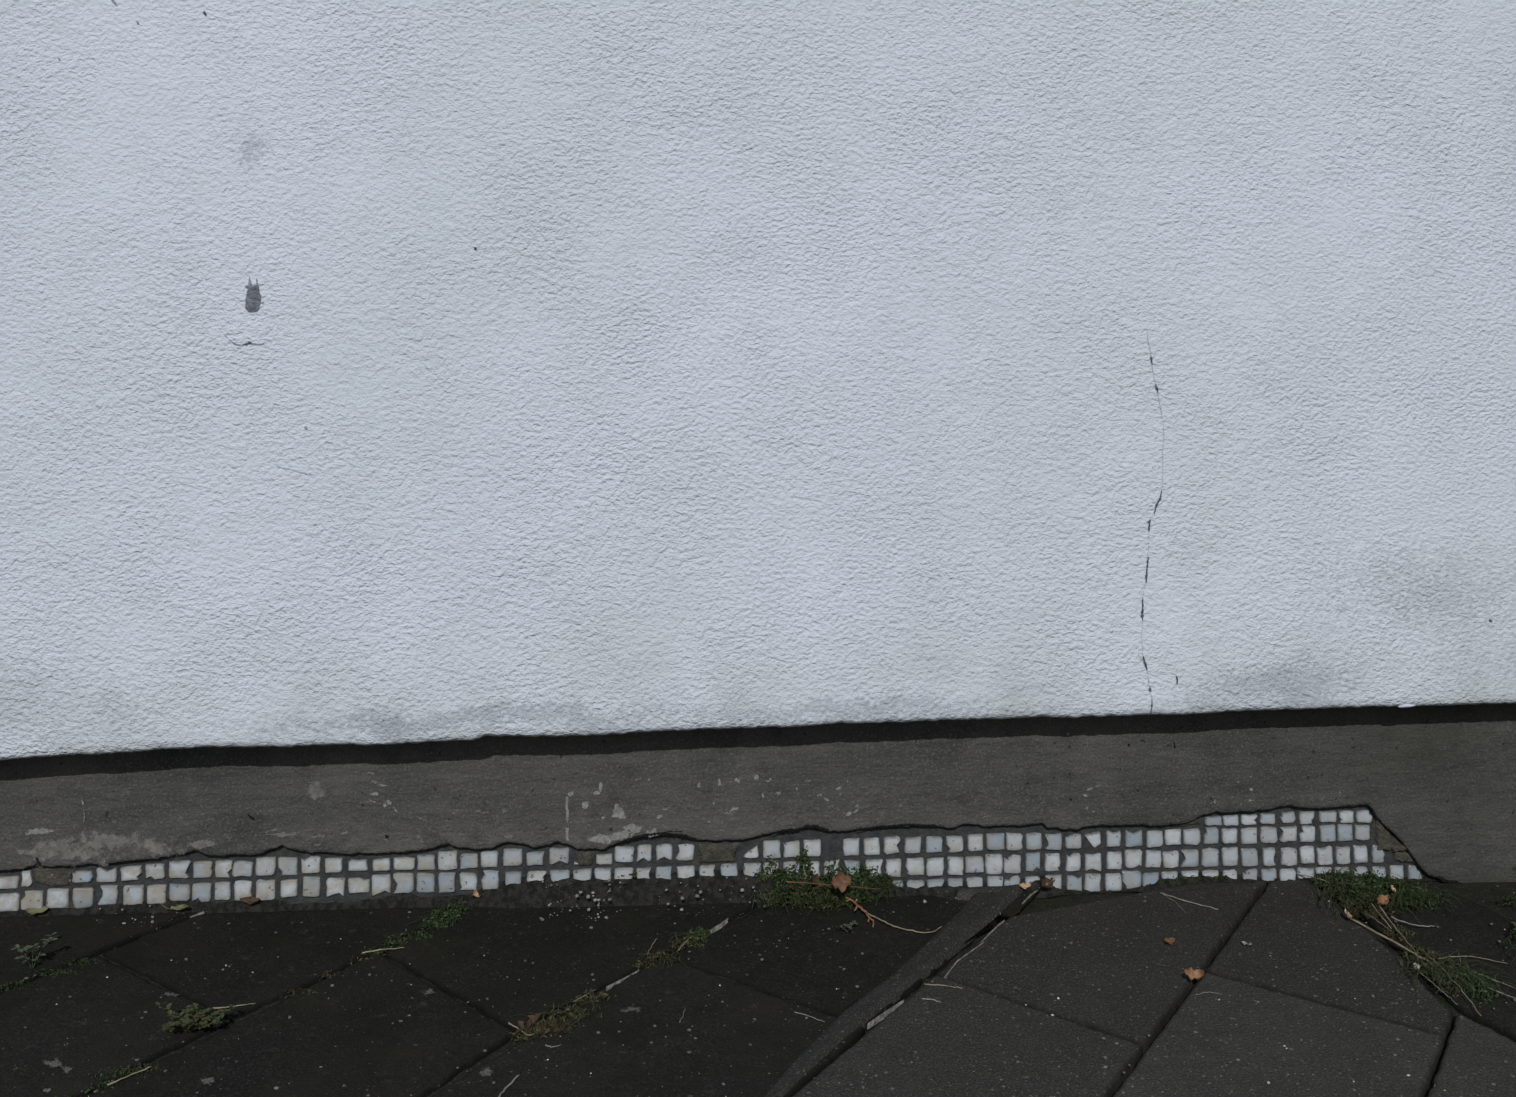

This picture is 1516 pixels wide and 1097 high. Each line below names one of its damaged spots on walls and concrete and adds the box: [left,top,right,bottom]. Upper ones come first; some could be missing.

crack [1138,332,1178,715]
peeling [18,828,215,888]
spalling [698,842,740,864]
spalling [1171,818,1201,828]
spalling [1373,813,1420,868]